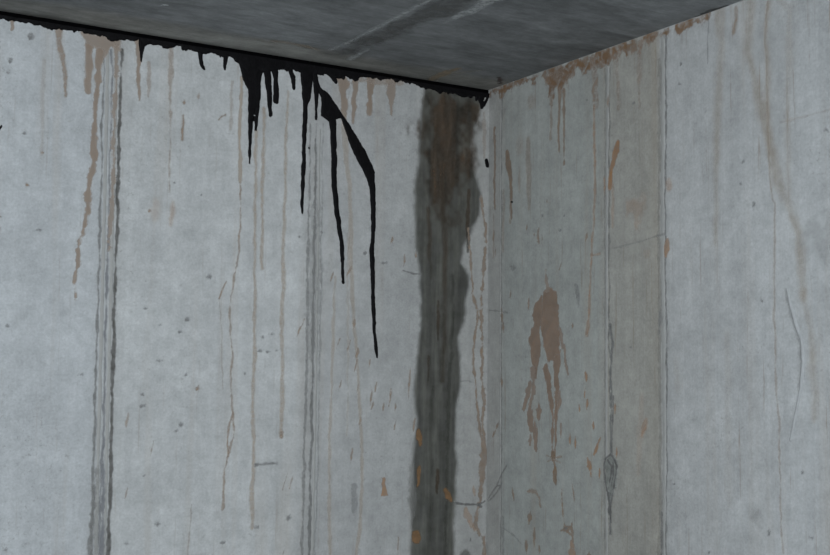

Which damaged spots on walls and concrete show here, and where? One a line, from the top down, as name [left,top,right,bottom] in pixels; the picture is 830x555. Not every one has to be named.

water stain [330,0,498,60]
corrosion [489,12,711,165]
water stain [0,15,490,555]
water stain [522,275,569,485]